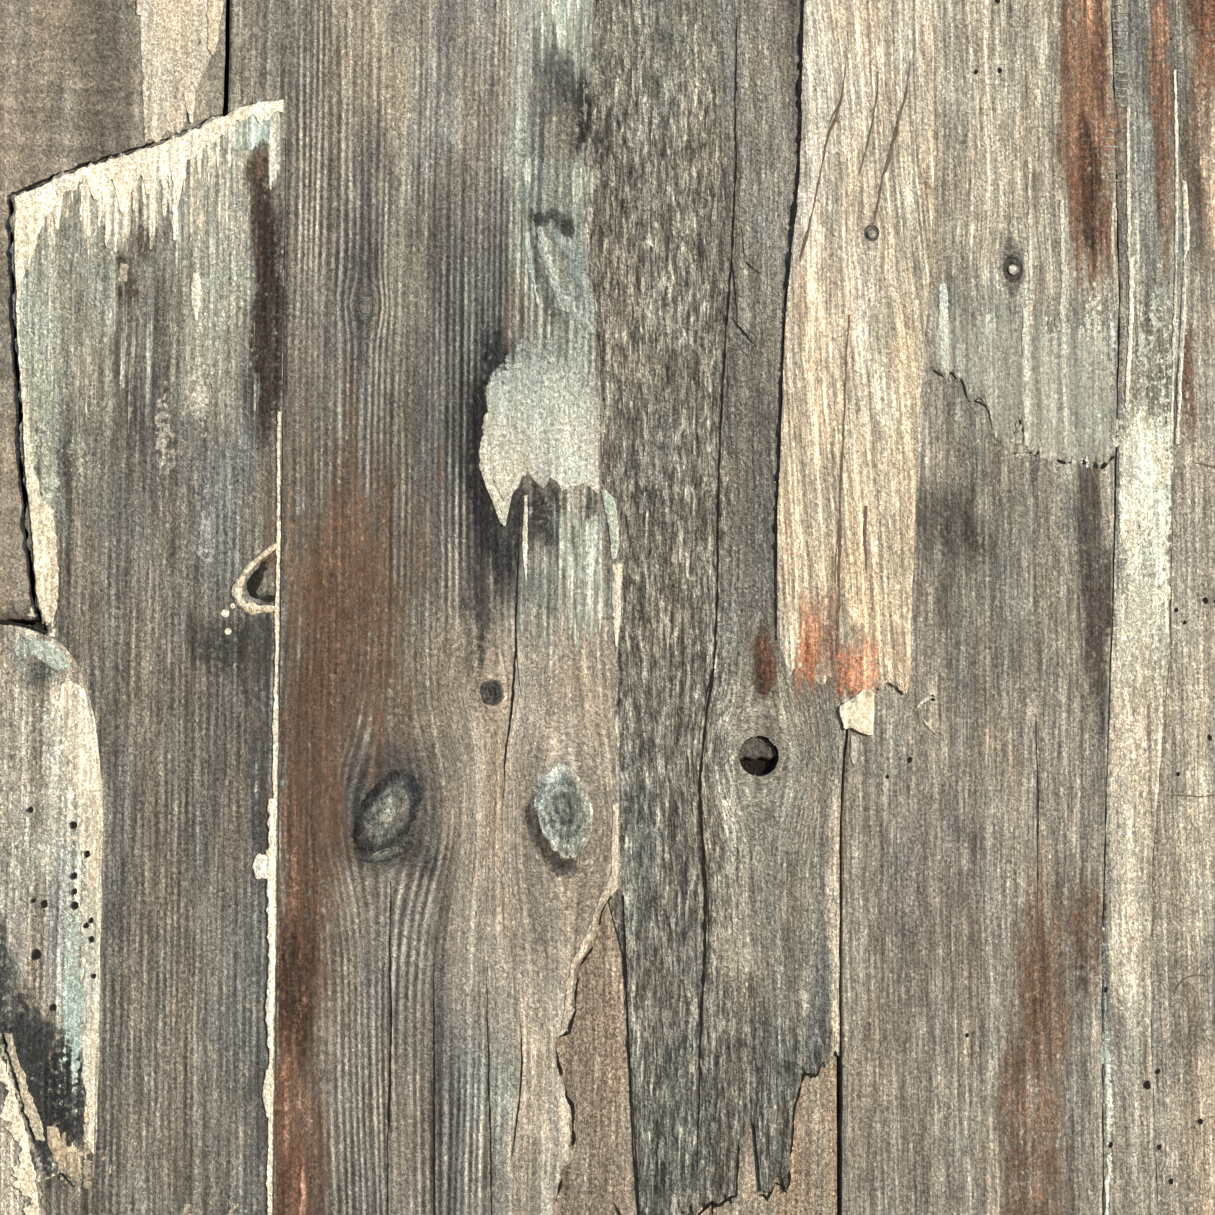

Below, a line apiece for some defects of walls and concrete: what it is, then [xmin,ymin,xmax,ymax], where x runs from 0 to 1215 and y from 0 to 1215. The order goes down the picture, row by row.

rust [1057,0,1122,285]
peeling [0,0,284,1215]
crack [503,513,522,799]
peeling [479,325,622,655]
rust [754,629,776,694]
crack [697,0,846,1170]
rust [795,593,906,697]
crack [835,315,868,656]
peeling [839,690,875,764]
crack [487,964,523,1215]
peeling [553,803,619,1038]
crack [554,895,639,1215]